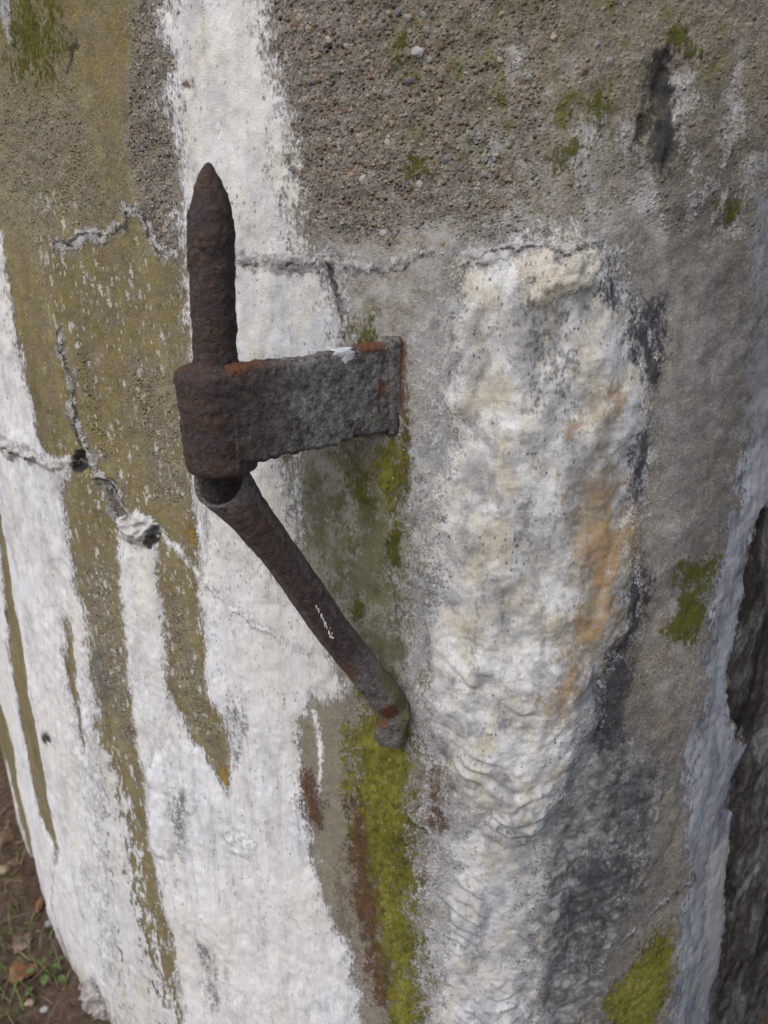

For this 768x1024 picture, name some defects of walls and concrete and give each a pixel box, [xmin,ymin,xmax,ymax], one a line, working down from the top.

spalling [394,8,451,73]
spalling [622,48,688,178]
crack [46,192,180,265]
crack [0,320,131,531]
corrosion [400,335,411,487]
water stain [377,190,768,1024]
corrosion [293,768,396,1008]